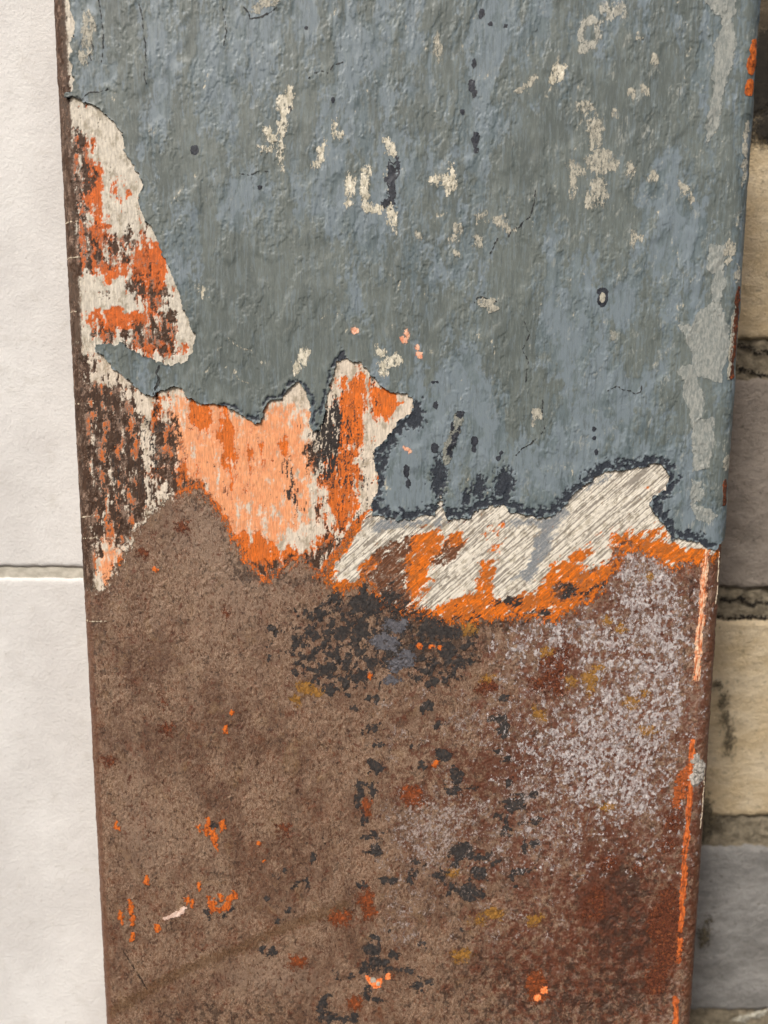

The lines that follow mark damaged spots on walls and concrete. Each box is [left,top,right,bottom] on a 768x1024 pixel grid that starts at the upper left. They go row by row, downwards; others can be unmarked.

peeling [54,0,720,627]
corrosion [171,518,192,536]
corrosion [473,678,503,698]
corrosion [526,644,575,699]
corrosion [656,763,693,855]
corrosion [327,883,379,929]
corrosion [643,883,684,997]
corrosion [524,966,550,1007]